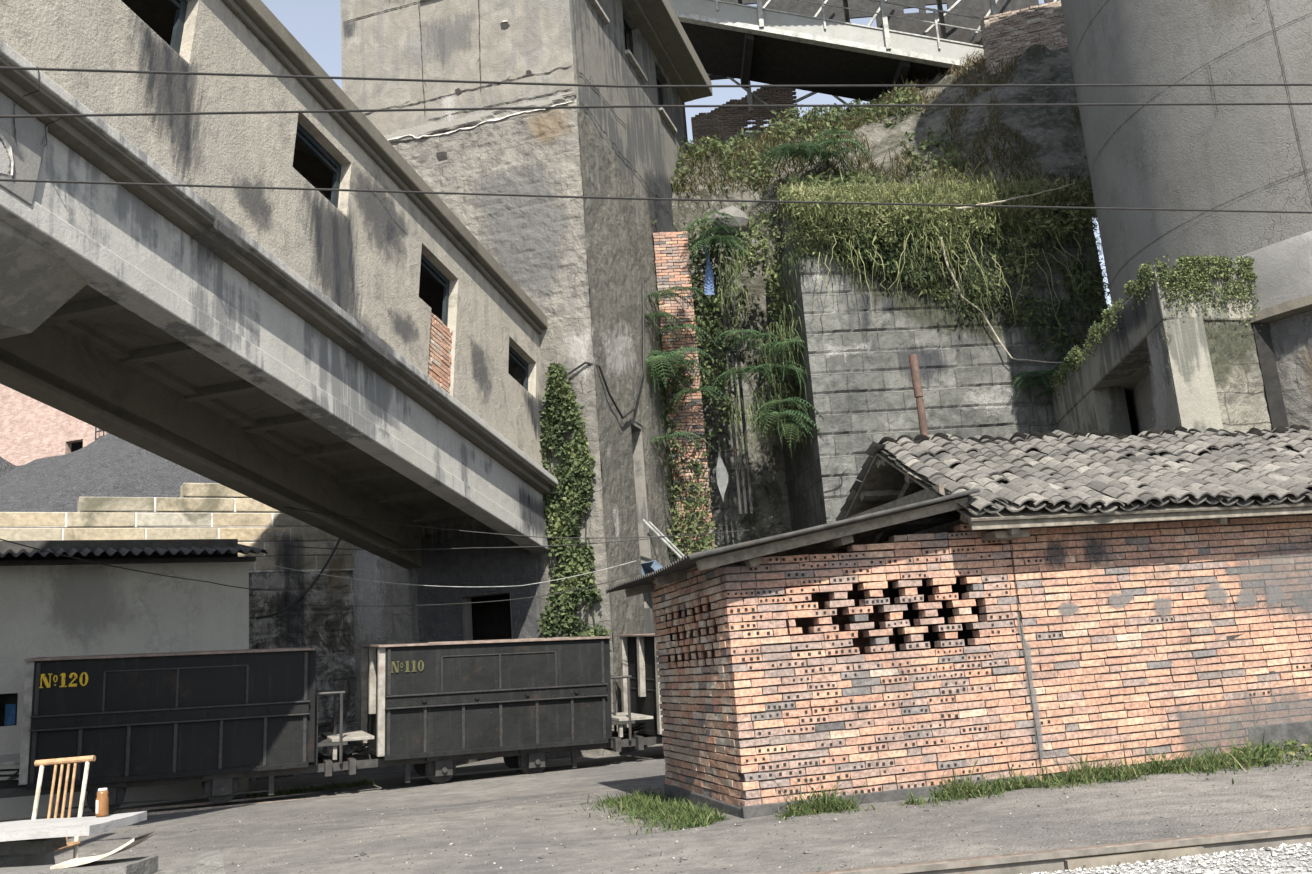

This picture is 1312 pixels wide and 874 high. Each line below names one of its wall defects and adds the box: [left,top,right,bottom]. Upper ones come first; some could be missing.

damp [140,24,198,183]
damp [239,180,268,227]
damp [306,173,406,312]
crack [1090,0,1312,300]
damp [391,311,417,341]
damp [253,531,296,622]